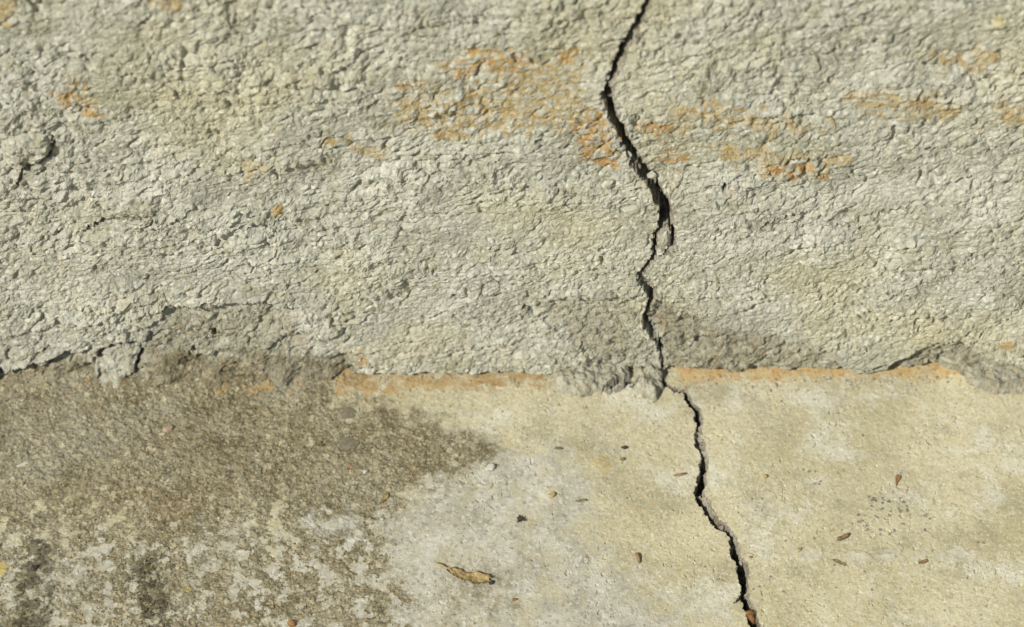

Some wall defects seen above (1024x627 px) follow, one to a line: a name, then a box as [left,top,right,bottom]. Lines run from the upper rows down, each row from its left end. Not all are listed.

damp [0,318,740,627]
crack [599,0,762,627]